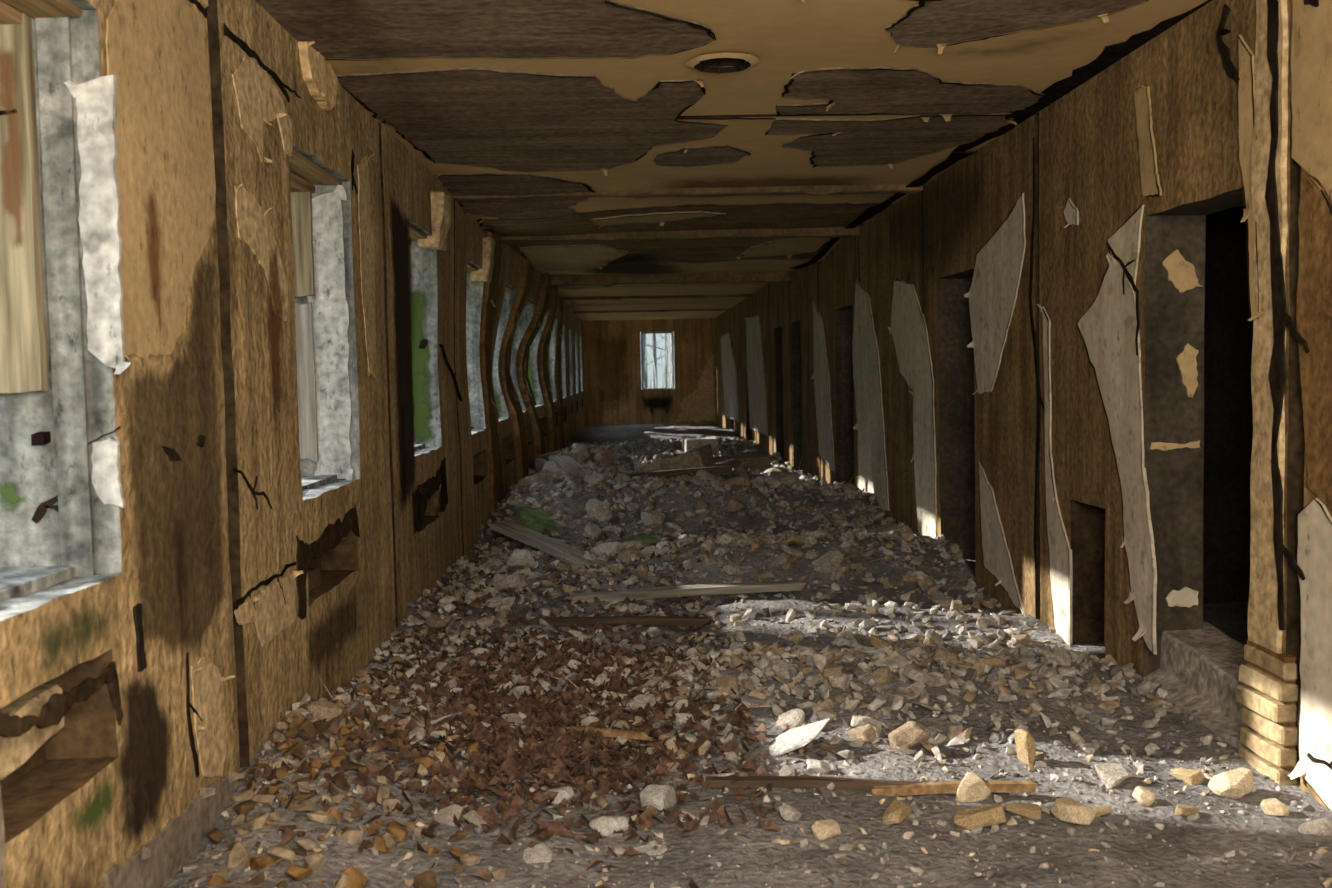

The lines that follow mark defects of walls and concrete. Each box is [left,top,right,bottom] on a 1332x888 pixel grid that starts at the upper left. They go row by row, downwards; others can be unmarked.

peeling [106,0,216,374]
damp [132,262,223,645]
crack [189,0,301,102]
crack [234,562,297,610]
peeling [255,0,892,269]
peeling [852,278,937,538]
crack [790,0,1310,630]
peeling [1037,304,1073,645]
peeling [1076,85,1162,655]
spalling [1288,167,1332,810]
damp [119,680,169,838]
crack [1307,753,1332,770]